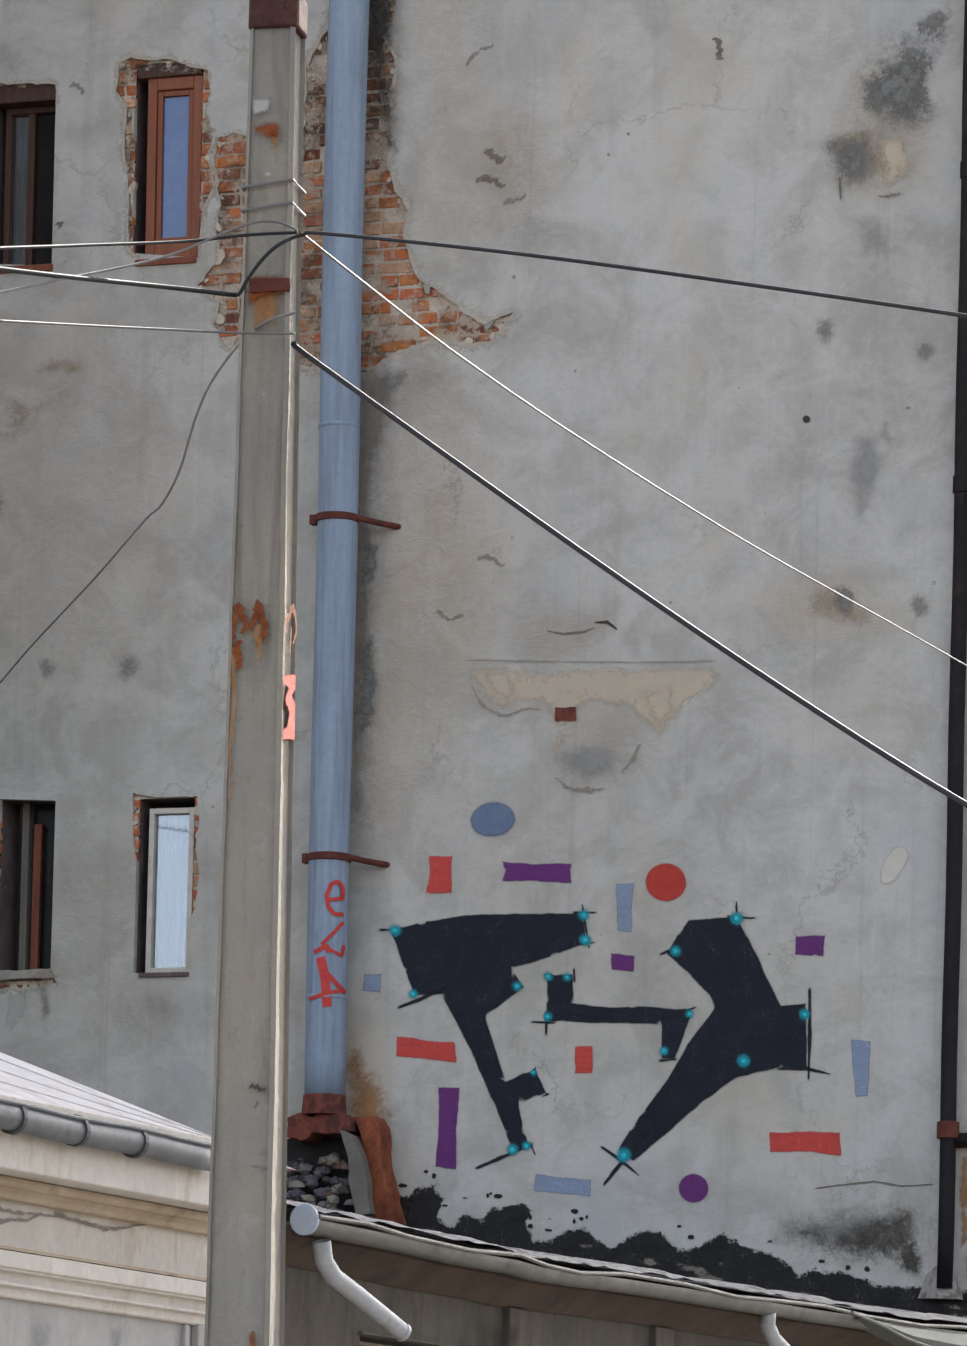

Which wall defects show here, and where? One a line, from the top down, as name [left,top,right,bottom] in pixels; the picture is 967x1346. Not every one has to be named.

flaking render [0,79,59,106]
flaking render [114,53,247,351]
flaking render [300,21,328,372]
flaking render [361,0,515,378]
rust [285,604,297,660]
rust [229,600,269,801]
flaking render [555,707,576,721]
flaking render [133,793,199,911]
flaking render [0,976,58,995]
rust [348,1054,383,1118]
damp [791,1214,920,1273]